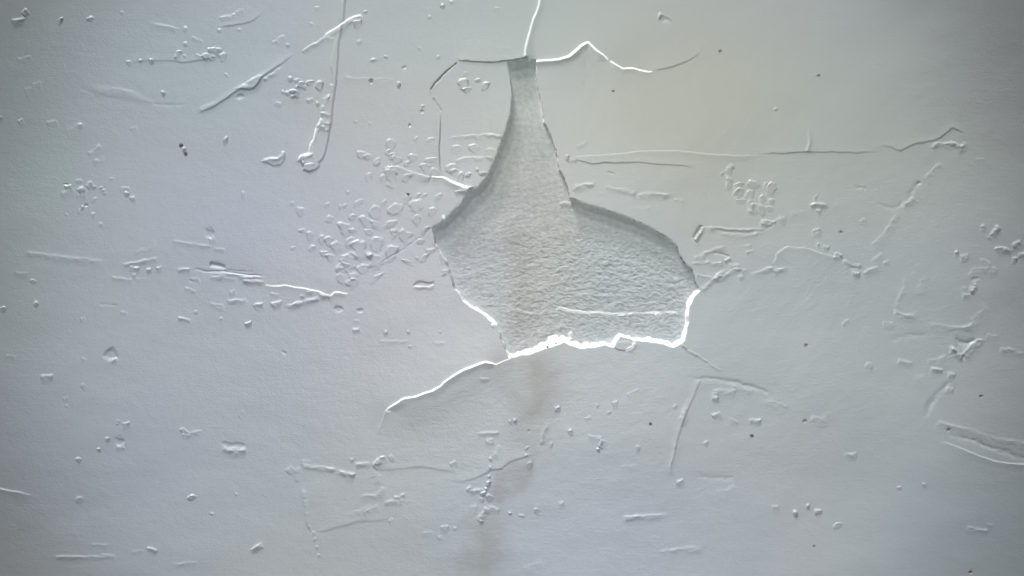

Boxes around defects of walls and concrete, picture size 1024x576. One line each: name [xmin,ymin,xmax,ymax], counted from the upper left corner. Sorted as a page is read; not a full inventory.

crack [383,0,703,189]
peeling [432,56,701,358]
crack [881,127,985,163]